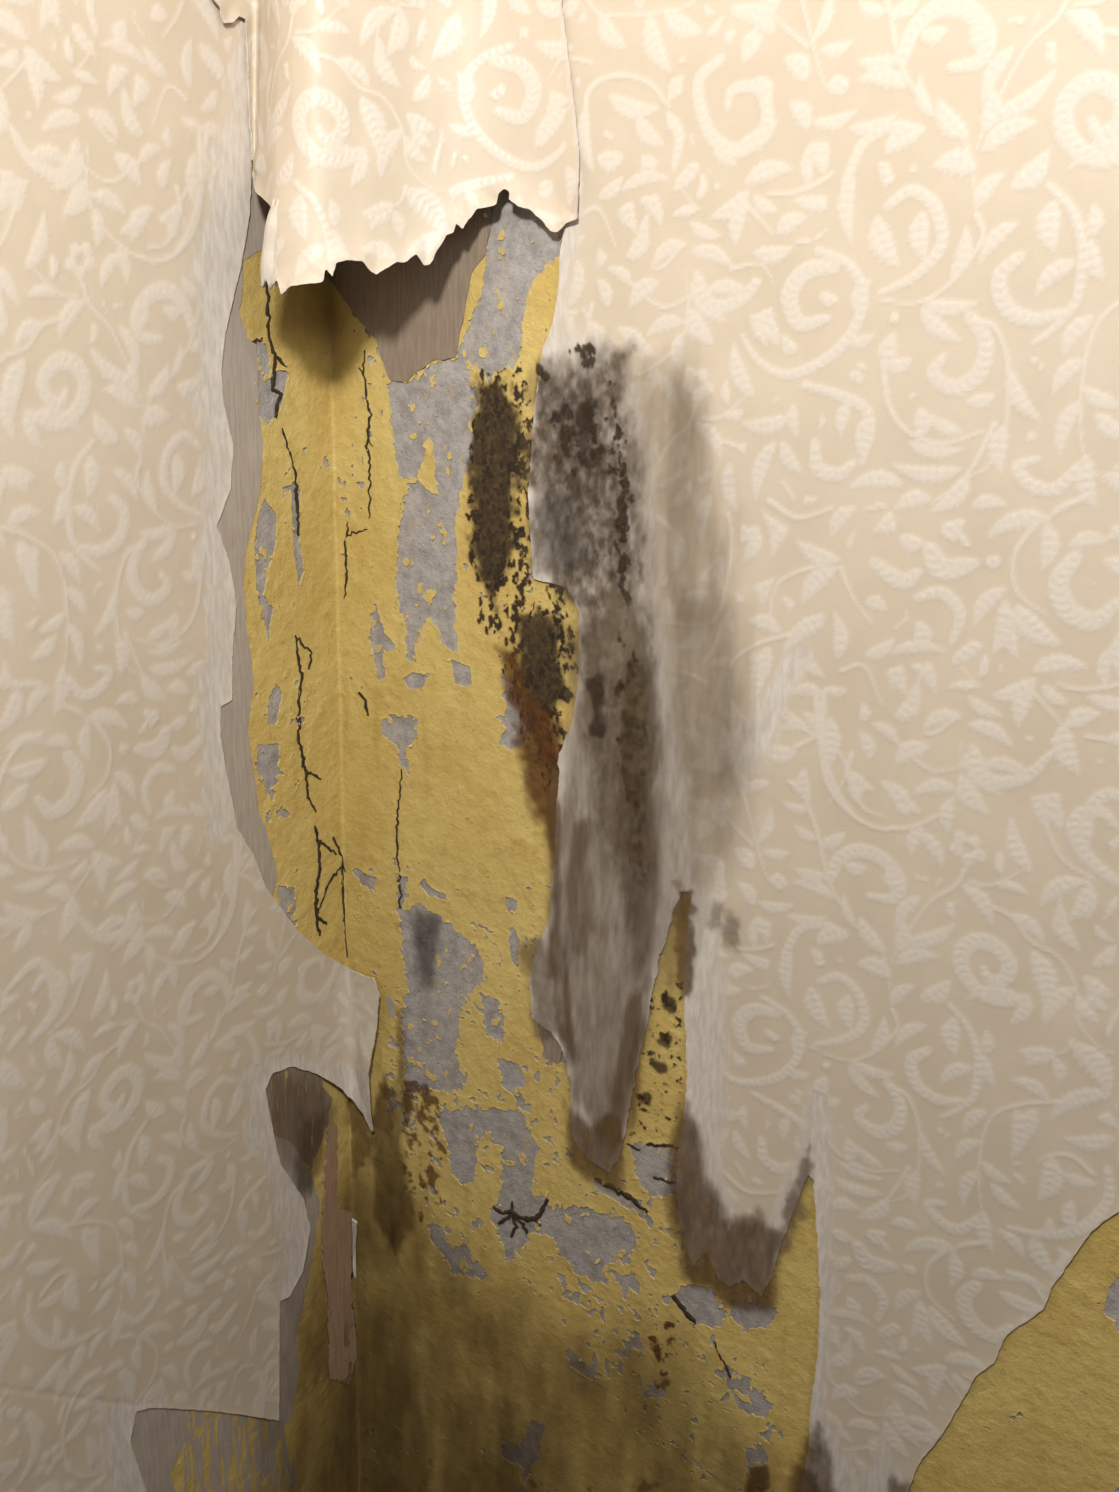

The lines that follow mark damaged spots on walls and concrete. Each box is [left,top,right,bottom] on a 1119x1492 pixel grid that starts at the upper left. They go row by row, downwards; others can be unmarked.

crack [251,284,301,536]
crack [344,350,373,598]
peeling [213,0,580,690]
peeling [255,685,282,795]
crack [295,635,348,958]
peeling [381,714,419,775]
leakage [465,343,810,1309]
leakage [350,1081,446,1254]
crack [492,1198,549,1238]
peeling [396,873,672,1298]
peeling [673,1284,779,1333]
leakage [795,1433,829,1492]